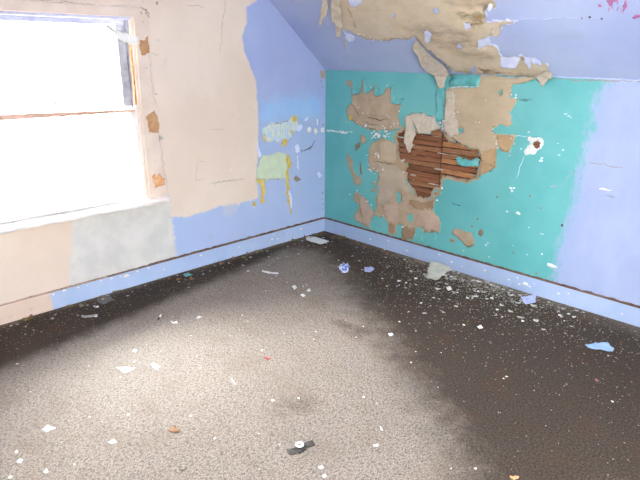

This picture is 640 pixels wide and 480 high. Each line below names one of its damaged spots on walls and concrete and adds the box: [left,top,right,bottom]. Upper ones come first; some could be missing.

peeling [252,114,325,214]
peeling [319,0,552,243]
peeling [450,226,484,251]